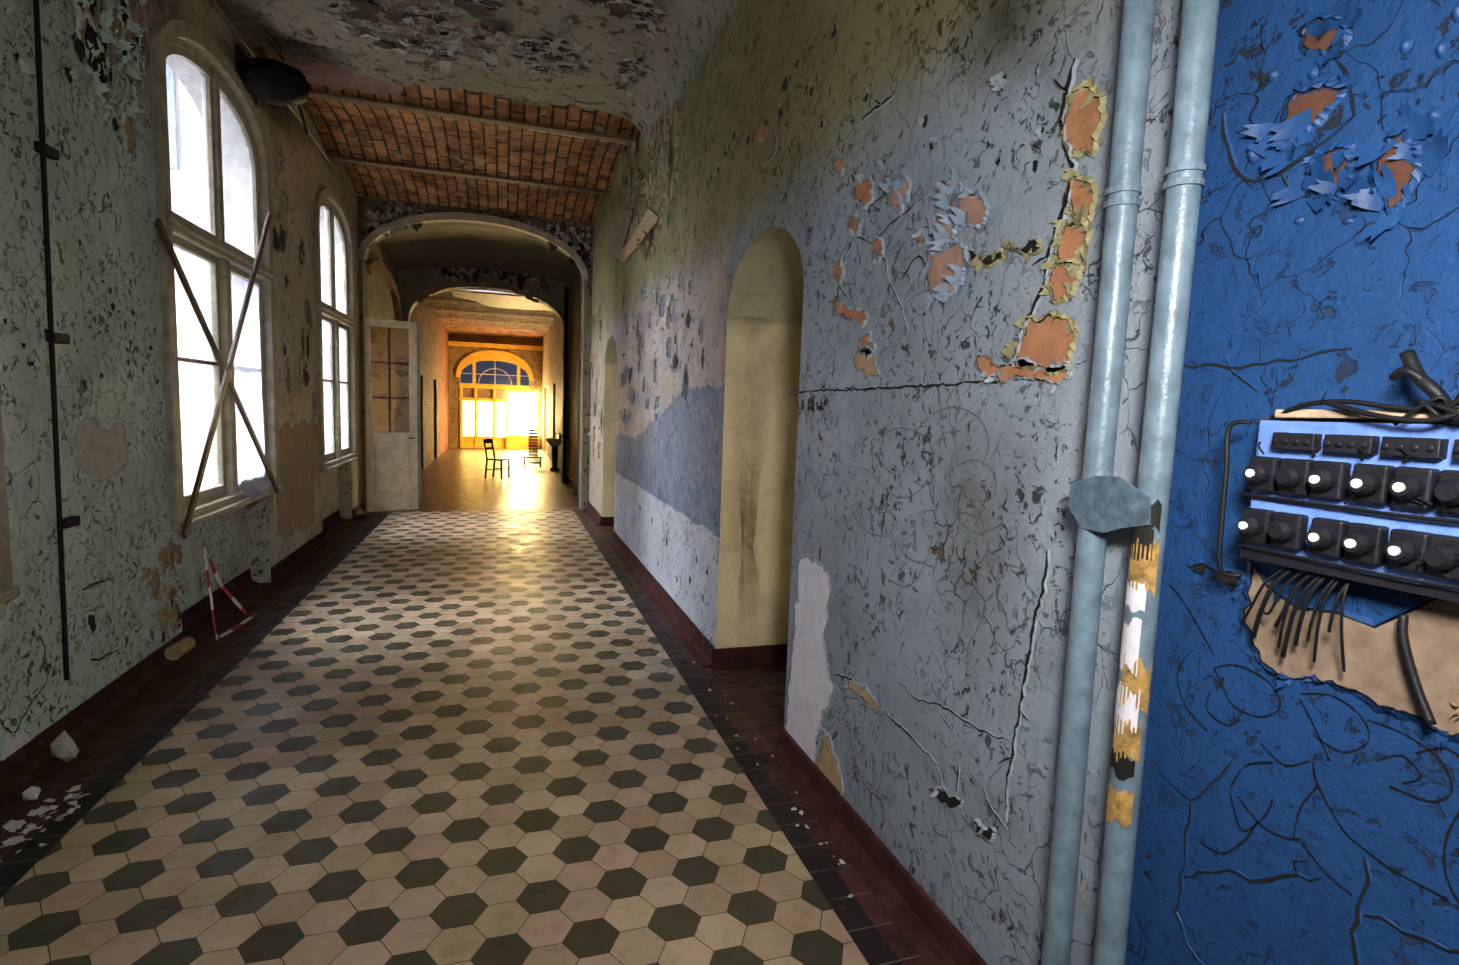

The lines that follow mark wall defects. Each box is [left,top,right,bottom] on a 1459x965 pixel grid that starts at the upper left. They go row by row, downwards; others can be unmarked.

peeling [313,0,596,78]
peeling [585,0,669,41]
peeling [614,57,652,98]
peeling [990,71,1007,91]
peeling [620,100,682,262]
crack [789,58,1080,394]
peeling [828,76,1108,394]
peeling [579,271,710,462]
peeling [785,553,885,796]
flaking render [1187,559,1459,747]
crack [1163,748,1321,965]
crack [1350,857,1459,965]